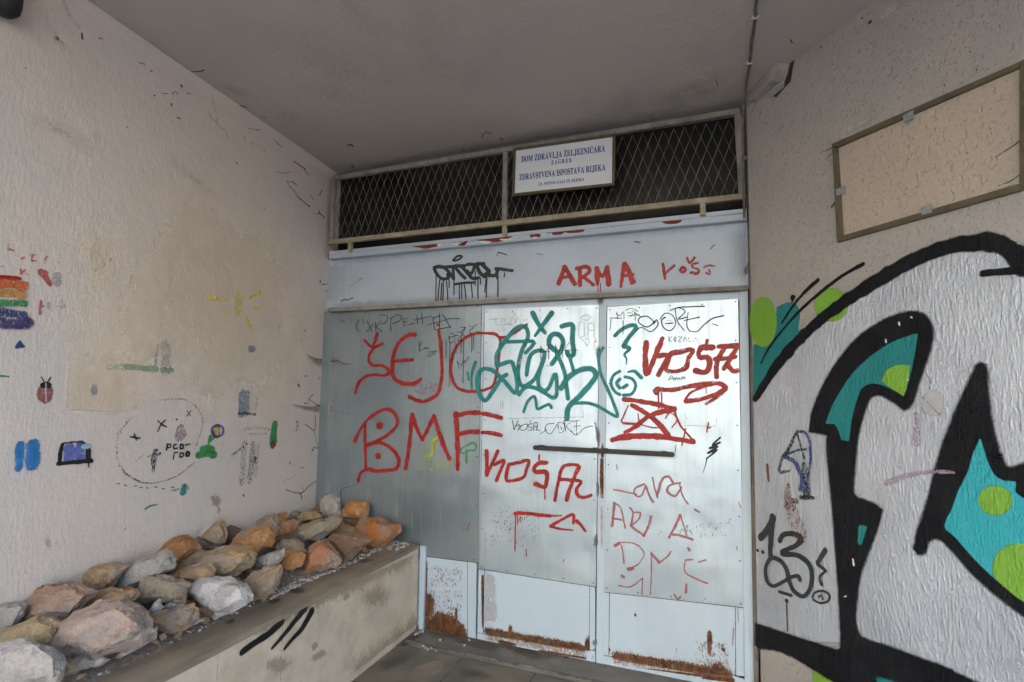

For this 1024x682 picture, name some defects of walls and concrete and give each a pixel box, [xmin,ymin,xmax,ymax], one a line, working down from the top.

corrosion [425,563,467,637]
corrosion [481,575,593,659]
corrosion [612,631,735,682]